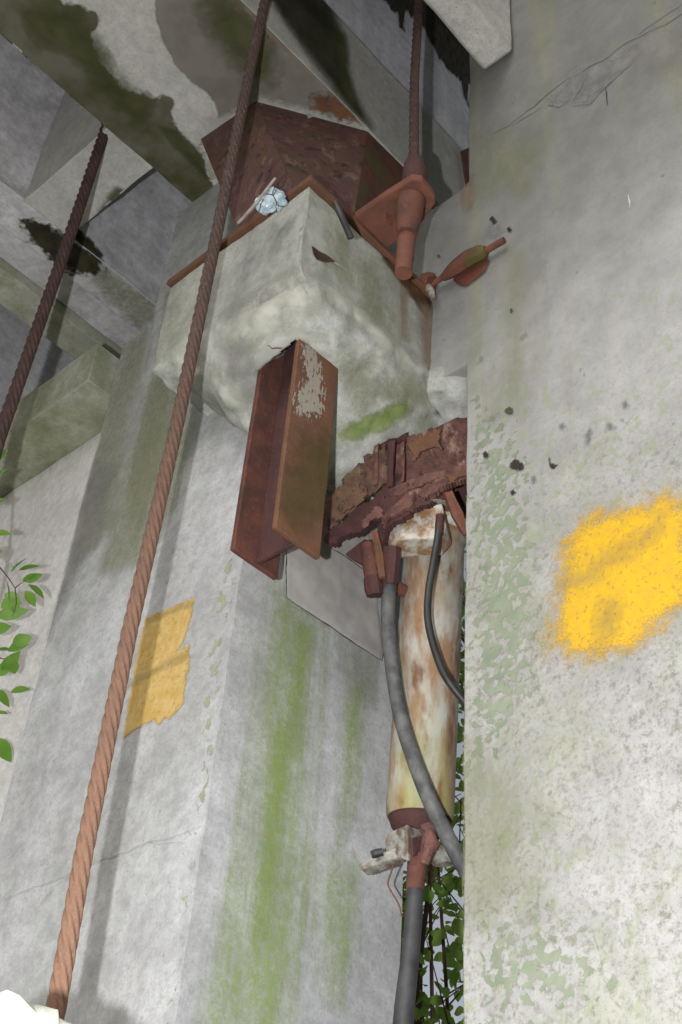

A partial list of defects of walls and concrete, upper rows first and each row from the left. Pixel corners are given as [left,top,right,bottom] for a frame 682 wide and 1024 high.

water stain [0,0,213,202]
corrosion [309,95,356,121]
water stain [19,219,106,276]